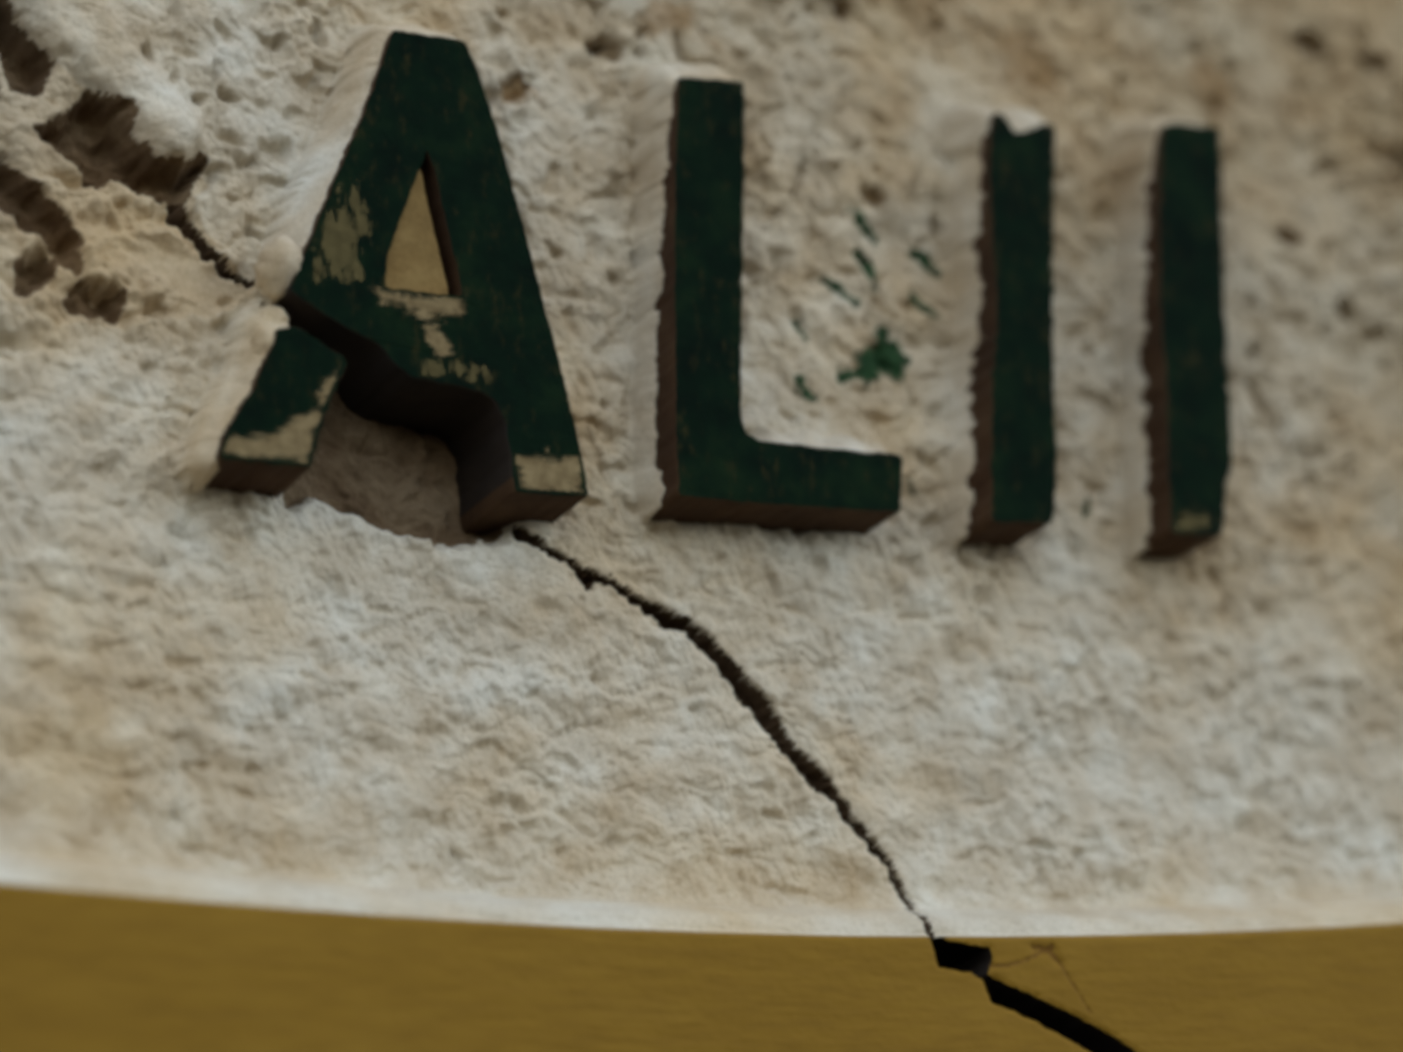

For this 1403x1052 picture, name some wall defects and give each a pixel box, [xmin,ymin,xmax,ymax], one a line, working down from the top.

spalling [0,0,257,331]
crack [159,201,255,289]
spalling [224,180,582,548]
spalling [498,72,532,103]
crack [510,525,1135,1052]